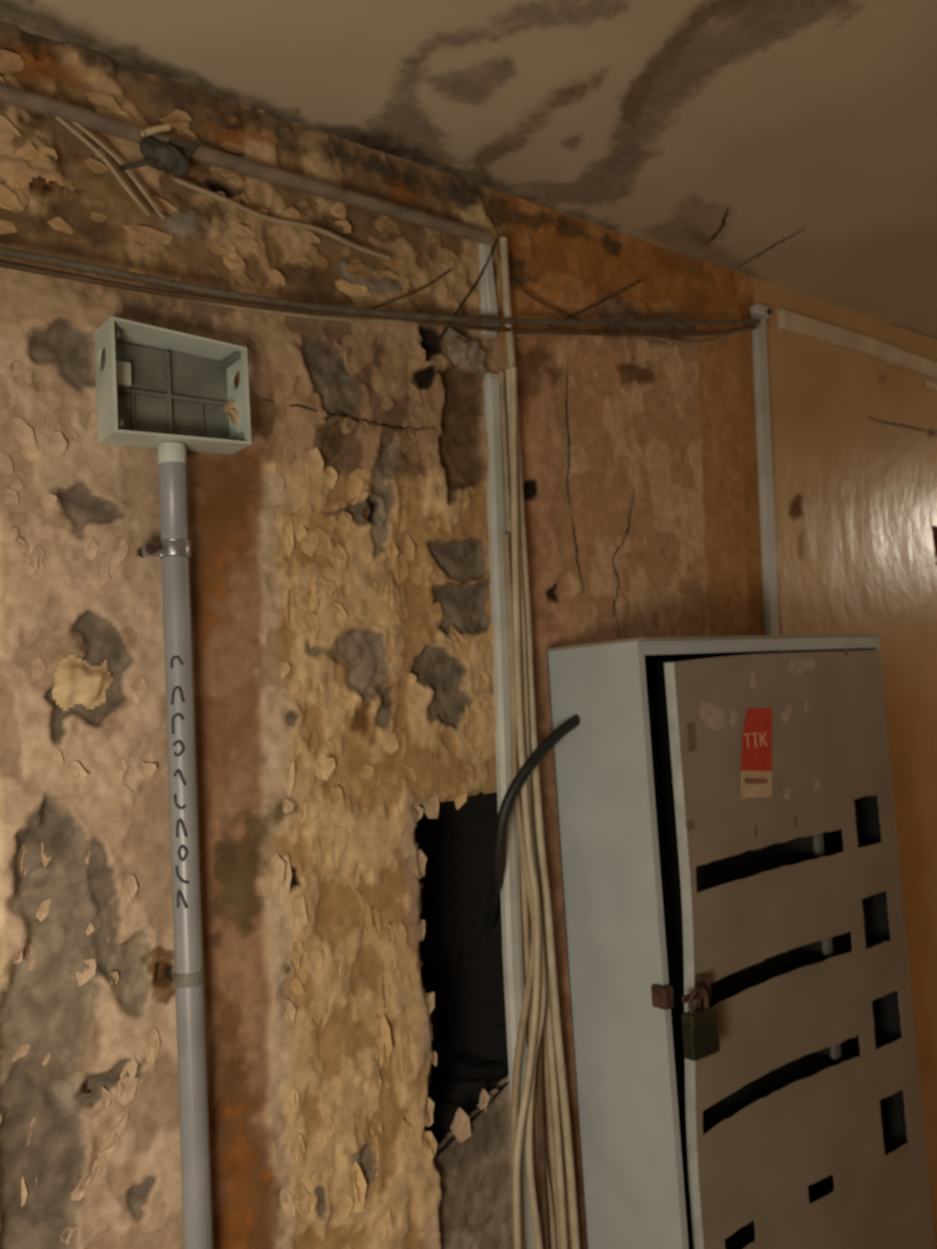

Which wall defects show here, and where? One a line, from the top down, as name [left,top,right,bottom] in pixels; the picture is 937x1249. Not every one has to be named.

leakage [0,200,105,244]
leakage [0,0,274,127]
leakage [193,181,239,221]
leakage [279,0,848,237]
peeling [0,319,98,507]
crack [263,399,437,430]
peeling [273,328,489,790]
crack [559,359,584,594]
crack [612,490,635,638]
flaking render [26,611,148,778]
flaking render [0,795,160,1249]
spalling [279,730,514,1249]